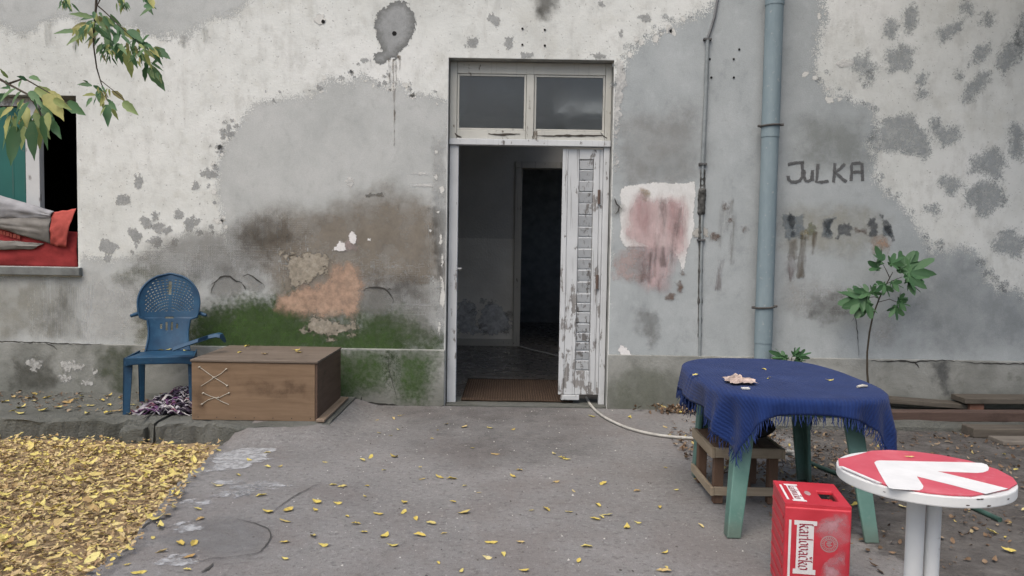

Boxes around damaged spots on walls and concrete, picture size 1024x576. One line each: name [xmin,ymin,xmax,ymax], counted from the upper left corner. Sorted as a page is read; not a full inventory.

crack [211,274,264,292]
peeling [0,0,480,350]
water stain [243,201,442,302]
peeling [590,0,765,357]
peeling [771,0,1024,361]